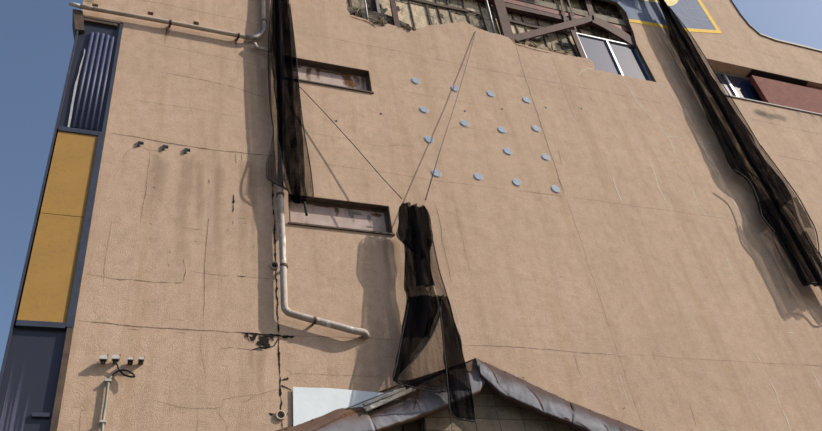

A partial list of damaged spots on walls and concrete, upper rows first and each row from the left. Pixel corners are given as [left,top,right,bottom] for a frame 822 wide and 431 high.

spalling [350,0,400,28]
corrosion [296,65,365,87]
crack [113,133,268,224]
crack [624,79,746,242]
crack [79,183,291,428]